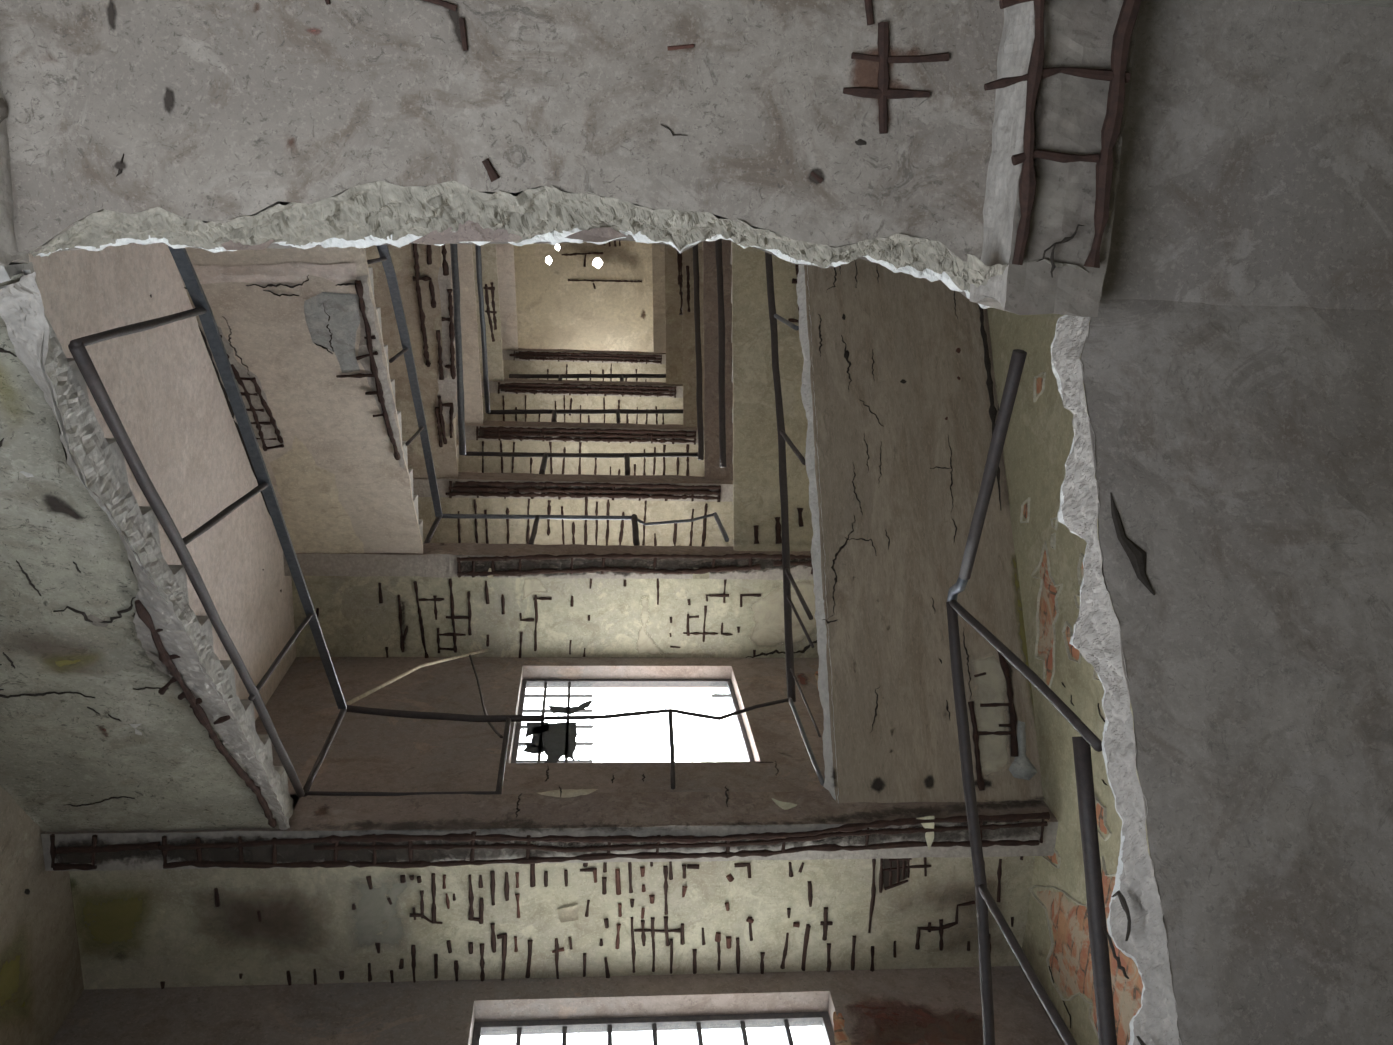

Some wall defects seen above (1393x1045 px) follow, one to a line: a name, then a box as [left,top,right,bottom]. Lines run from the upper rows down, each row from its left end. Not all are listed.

spalling [0,0,1142,983]
crack [930,435,957,541]
crack [16,560,136,627]
crack [1110,493,1155,595]
crack [0,652,169,722]
crack [871,687,880,732]
crack [932,598,972,719]
spalling [1028,315,1182,1045]
flaking render [833,1001,984,1045]